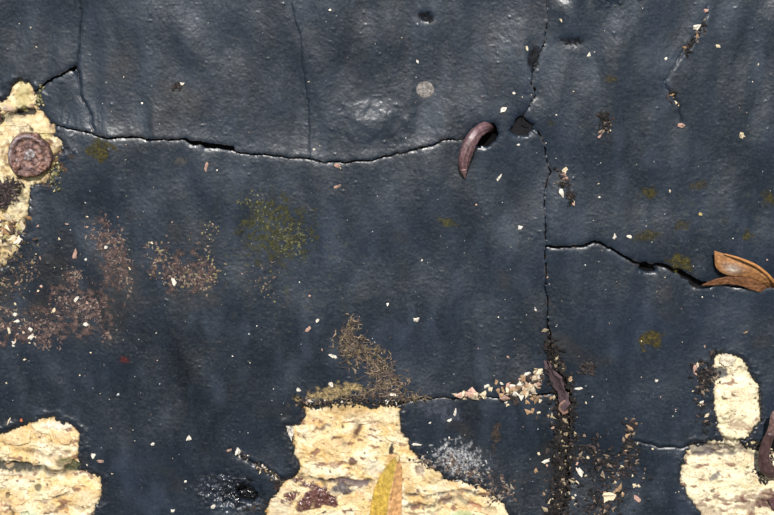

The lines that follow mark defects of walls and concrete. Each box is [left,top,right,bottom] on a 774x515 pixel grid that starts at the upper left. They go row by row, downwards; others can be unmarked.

crack [35,2,151,140]
crack [170,2,465,162]
peeling [0,78,64,267]
crack [521,114,740,365]
peeling [0,416,102,515]
peeling [264,401,509,515]
crack [622,440,707,449]
peeling [680,353,774,515]